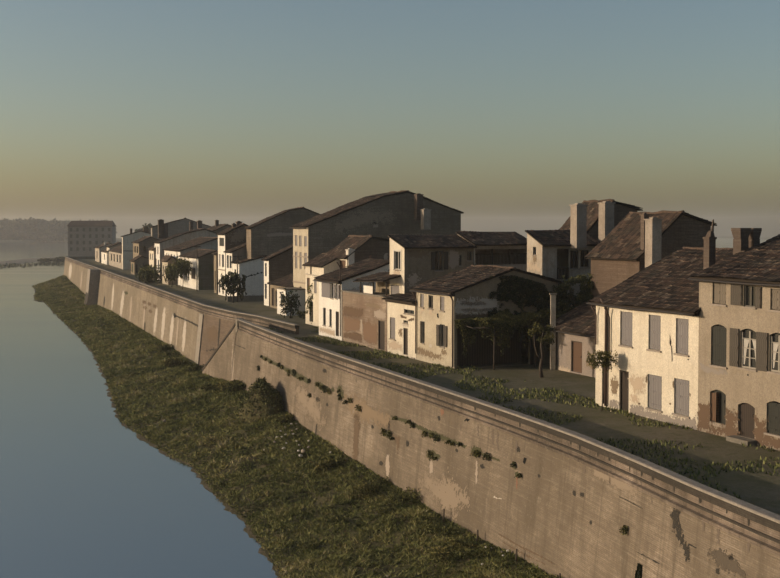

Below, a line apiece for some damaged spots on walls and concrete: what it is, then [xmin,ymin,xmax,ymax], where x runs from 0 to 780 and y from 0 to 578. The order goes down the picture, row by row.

flaking render [697,401,740,437]
flaking render [752,415,780,451]
peeling [418,471,470,521]